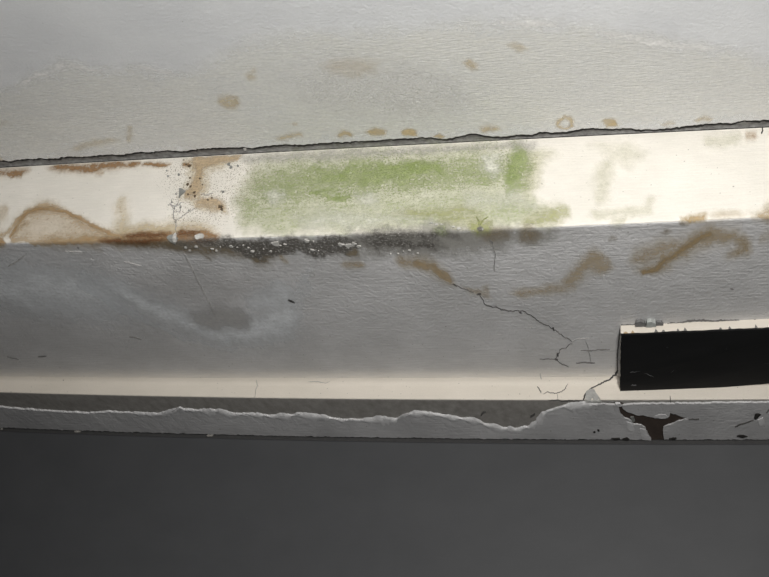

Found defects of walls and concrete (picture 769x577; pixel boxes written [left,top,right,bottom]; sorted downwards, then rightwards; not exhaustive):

crack [0,120,769,167]
leakage [0,203,125,246]
leakage [161,222,551,283]
leakage [0,265,299,346]
crack [453,284,635,403]
crack [663,317,756,325]
peeling [0,401,769,441]